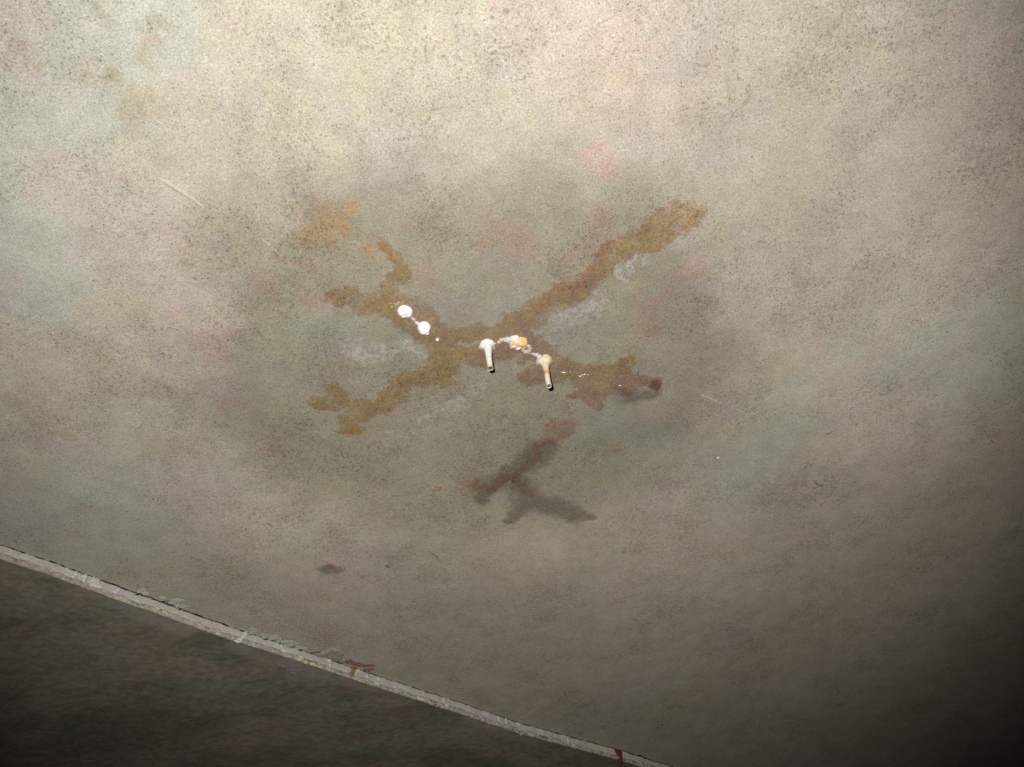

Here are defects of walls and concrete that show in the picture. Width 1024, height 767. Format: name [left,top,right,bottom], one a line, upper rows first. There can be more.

rust [278,183,365,267]
damp [117,74,791,602]
rust [298,195,710,436]